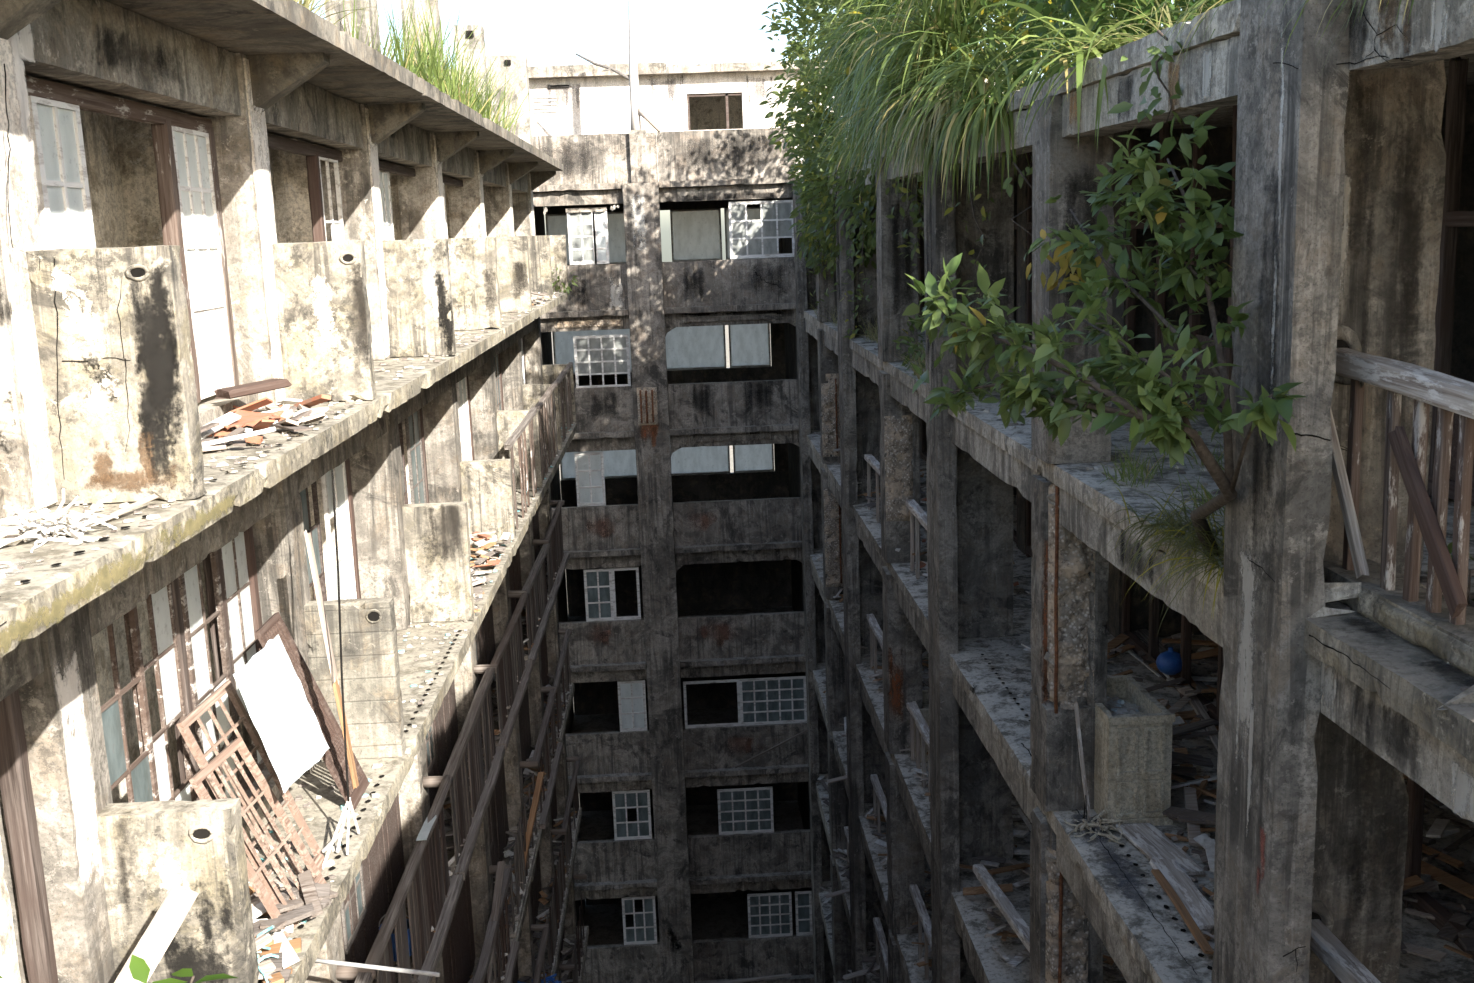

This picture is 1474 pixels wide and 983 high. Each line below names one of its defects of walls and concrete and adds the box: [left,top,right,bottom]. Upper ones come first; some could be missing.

crack [4,64,131,480]
water stain [82,354,118,401]
water stain [90,269,183,493]
water stain [423,259,454,356]
peeling [55,652,104,883]